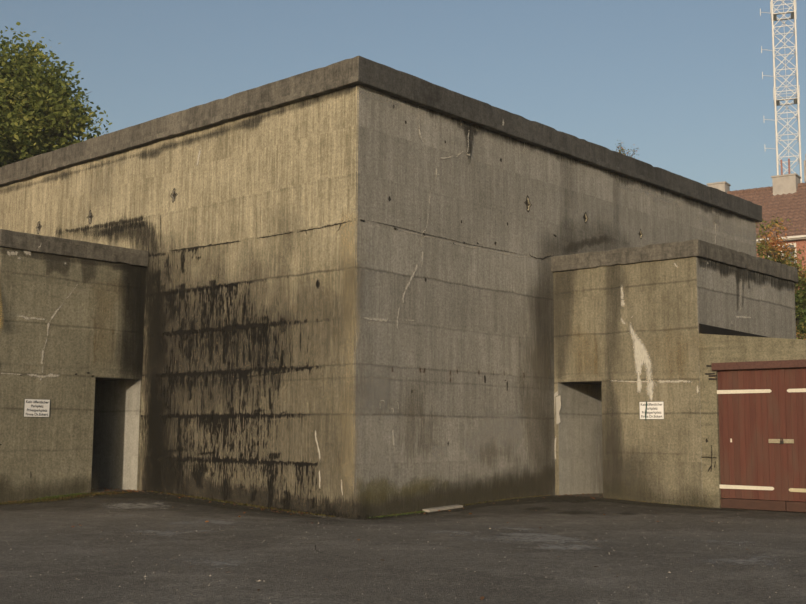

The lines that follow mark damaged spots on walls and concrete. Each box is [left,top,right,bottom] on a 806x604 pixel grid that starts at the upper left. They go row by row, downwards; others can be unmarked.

water stain [67,216,145,240]
crack [160,216,239,251]
crack [260,133,551,328]
crack [19,284,78,373]
water stain [698,257,796,323]
water stain [0,243,745,538]